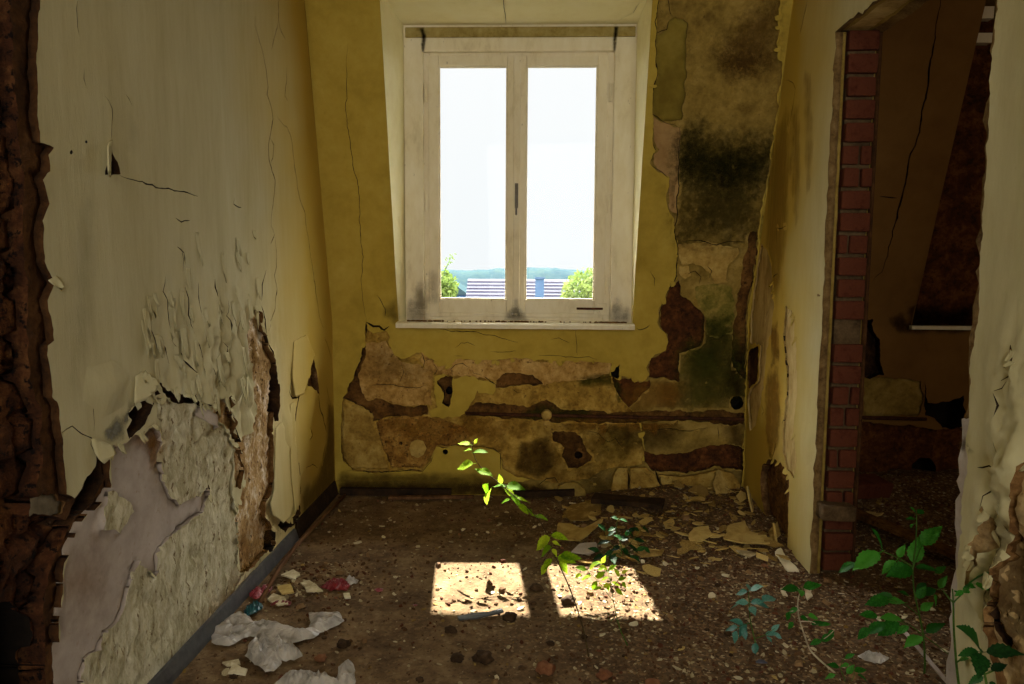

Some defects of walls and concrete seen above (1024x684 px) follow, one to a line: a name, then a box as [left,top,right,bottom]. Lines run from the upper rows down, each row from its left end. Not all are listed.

peeling [0,0,301,684]
crack [345,50,389,333]
flaking render [341,0,799,572]
mould [677,129,773,246]
damp [766,328,780,455]
crack [871,0,941,283]
flaking render [859,96,1024,684]